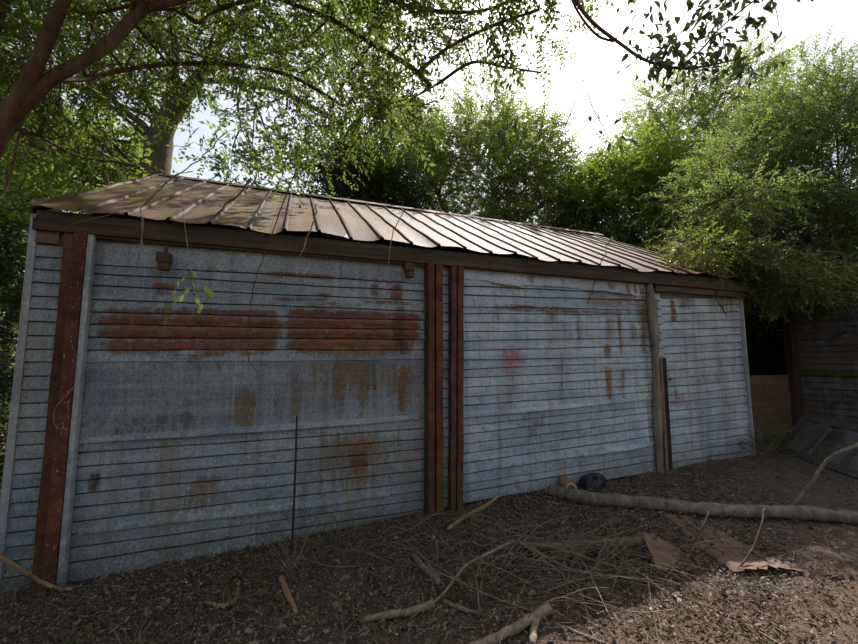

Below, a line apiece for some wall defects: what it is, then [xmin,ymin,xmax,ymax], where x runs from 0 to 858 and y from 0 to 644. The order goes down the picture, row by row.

rust [268,272,334,280]
rust [96,279,421,413]